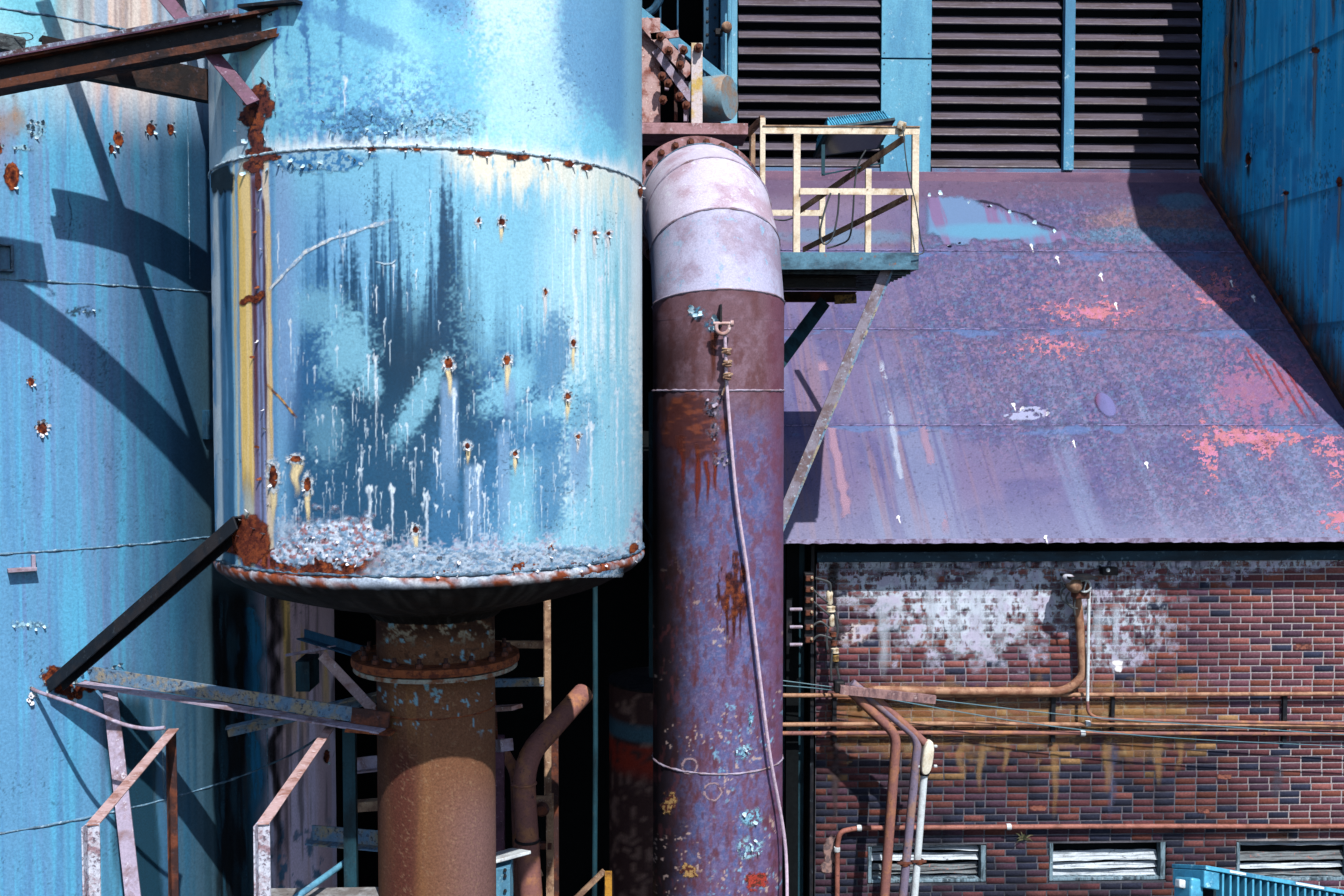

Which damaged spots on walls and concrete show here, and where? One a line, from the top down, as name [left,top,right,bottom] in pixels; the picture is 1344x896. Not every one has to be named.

corrosion [0,144,23,190]
corrosion [109,130,125,153]
corrosion [145,120,176,135]
corrosion [458,146,595,172]
corrosion [1221,0,1256,176]
corrosion [1309,47,1320,130]
corrosion [1281,189,1289,234]
corrosion [222,77,386,579]
corrosion [34,419,52,438]
corrosion [663,393,728,508]
corrosion [716,550,747,636]
leakage [819,560,1342,670]